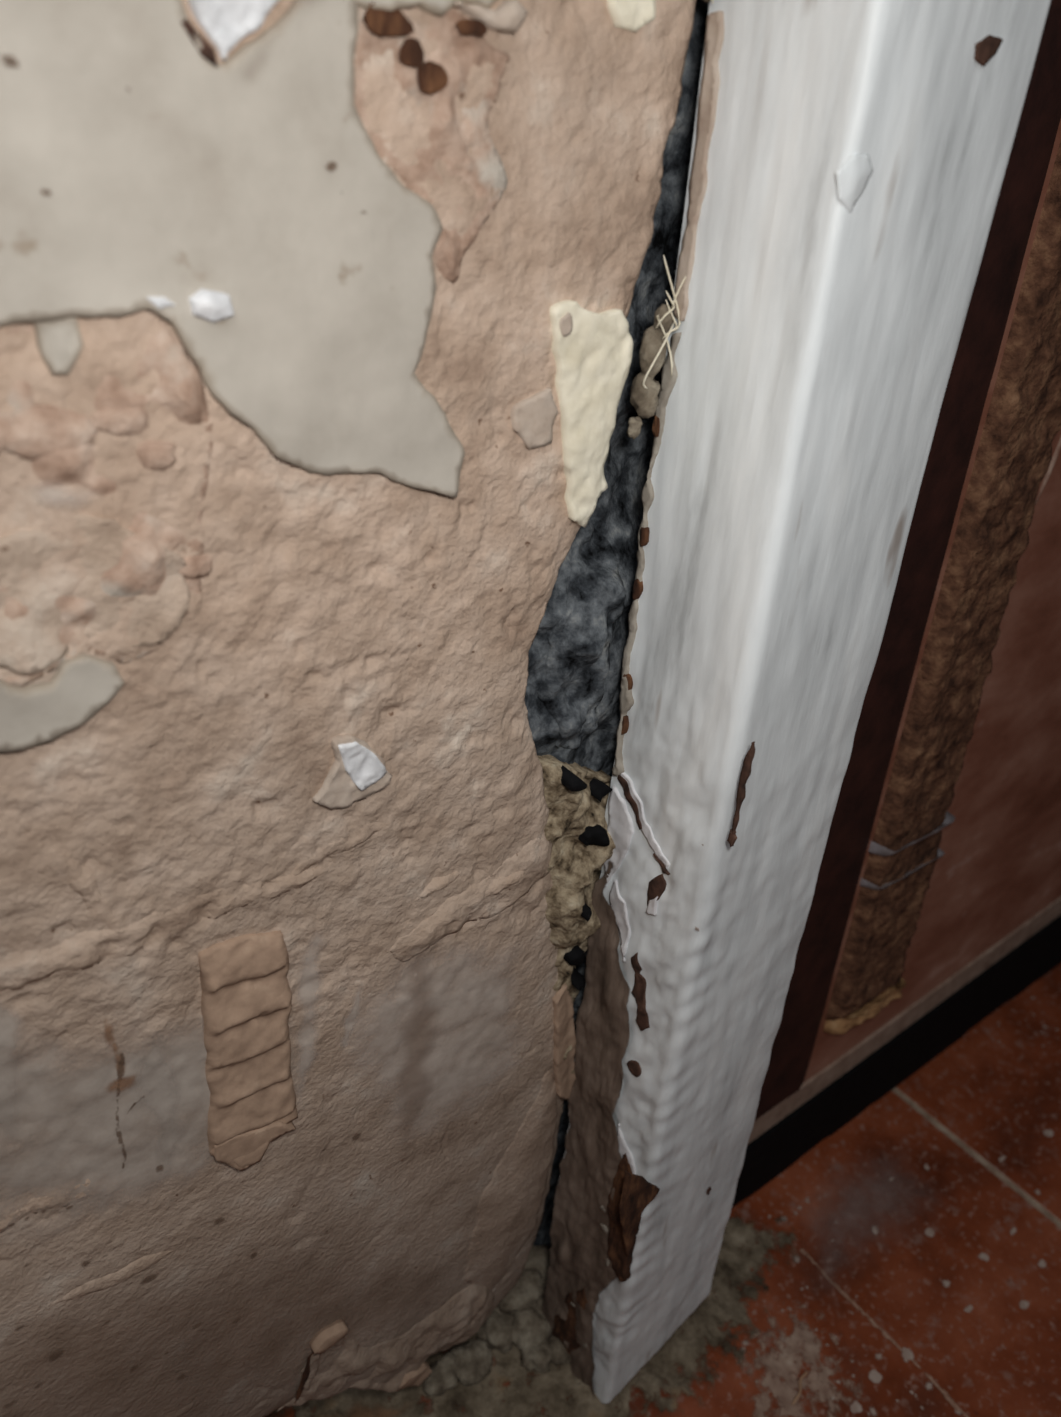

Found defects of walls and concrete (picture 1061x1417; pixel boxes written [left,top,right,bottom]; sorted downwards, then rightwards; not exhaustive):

peeling [0,0,528,752]
peeling [510,300,633,527]
peeling [541,10,724,1398]